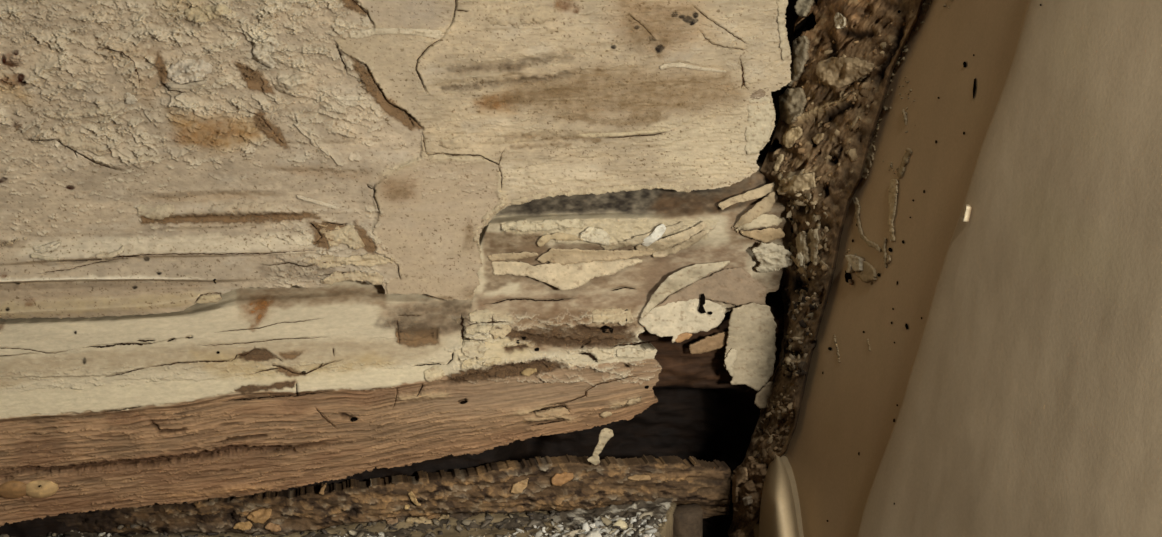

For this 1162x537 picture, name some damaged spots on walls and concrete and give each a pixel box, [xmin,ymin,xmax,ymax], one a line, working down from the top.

crack [696,8,749,89]
peeling [776,0,791,61]
flaking render [834,12,847,29]
spalling [354,60,423,130]
crack [335,0,503,188]
crack [609,131,666,139]
peeling [718,89,825,281]
crack [31,222,349,276]
peeling [487,221,707,290]
crack [1,318,341,428]
crack [394,298,564,406]
peeling [424,261,777,409]